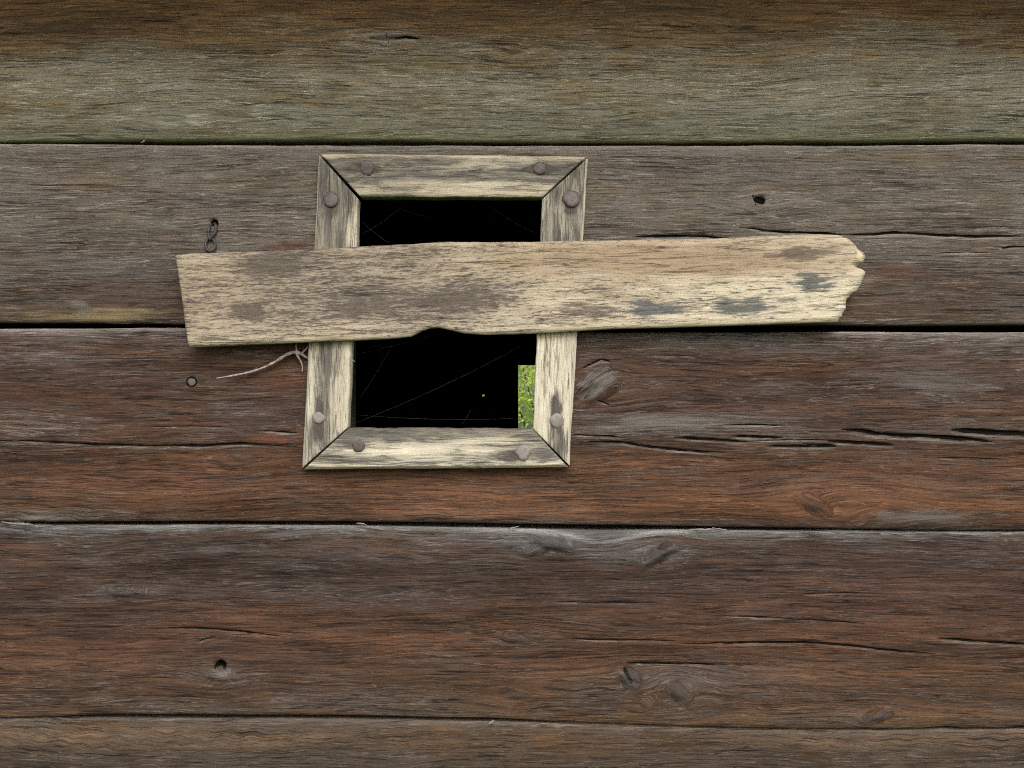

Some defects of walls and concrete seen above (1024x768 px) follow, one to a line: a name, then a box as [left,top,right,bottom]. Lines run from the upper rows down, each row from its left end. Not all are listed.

crack [635,227,1024,253]
crack [573,424,1024,459]
crack [564,615,1024,684]